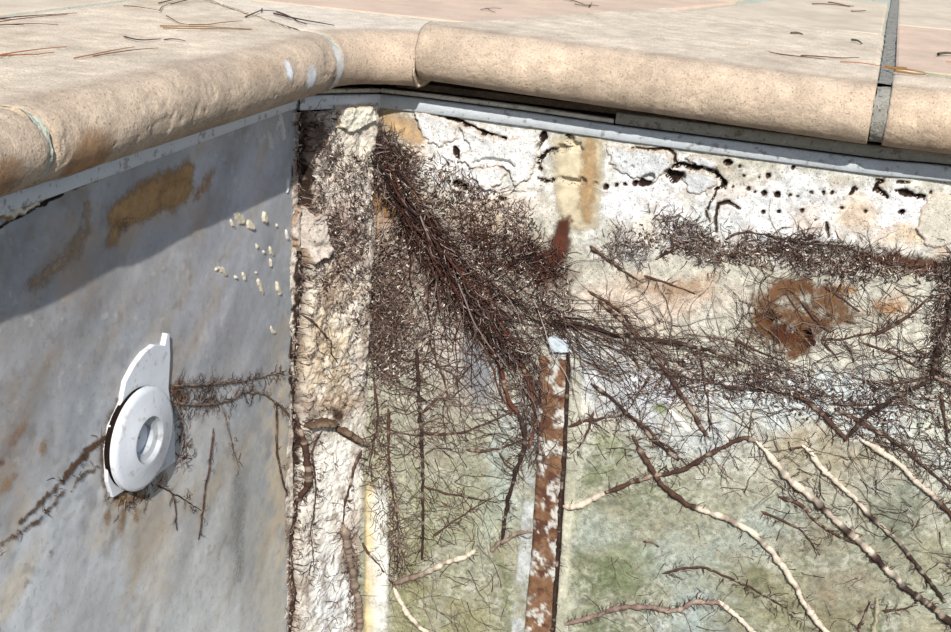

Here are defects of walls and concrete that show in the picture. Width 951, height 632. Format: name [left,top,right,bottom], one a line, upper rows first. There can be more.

peeling [335,103,377,133]
spalling [0,181,96,228]
corrosion [108,160,212,247]
peeling [605,144,741,233]
corrosion [532,215,573,282]
corrosion [747,278,855,360]